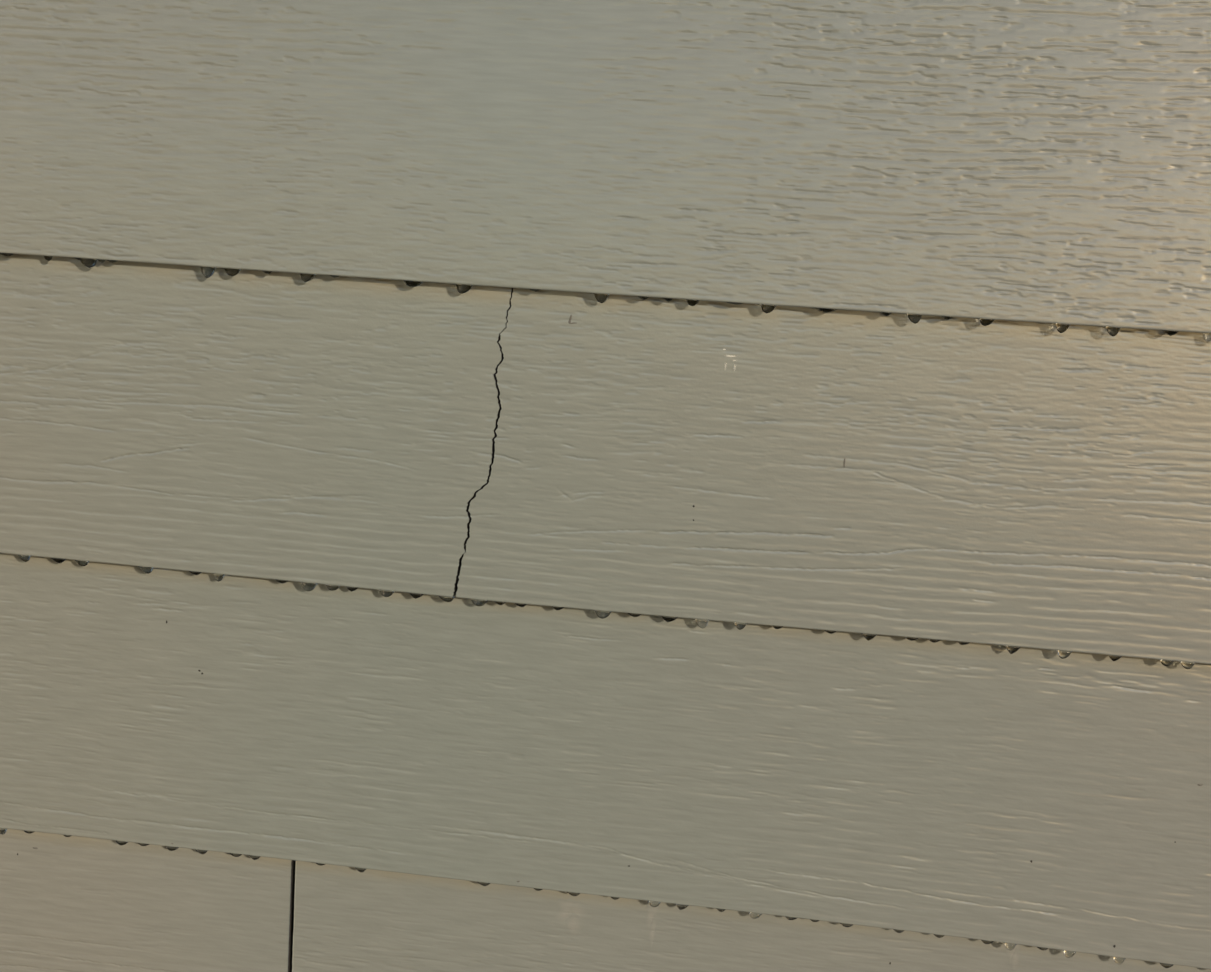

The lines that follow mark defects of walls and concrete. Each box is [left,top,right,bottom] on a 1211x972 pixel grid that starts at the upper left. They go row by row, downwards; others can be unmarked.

crack [453,288,513,595]